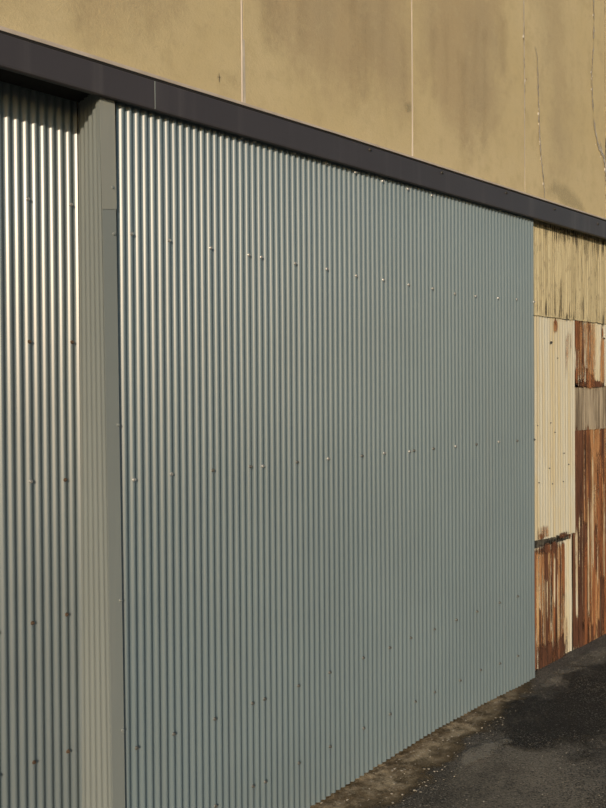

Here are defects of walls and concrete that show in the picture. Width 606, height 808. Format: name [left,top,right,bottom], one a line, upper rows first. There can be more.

crack [523,0,545,199]
crack [590,0,606,173]
damp [539,225,604,256]
corrosion [567,320,605,388]
corrosion [535,426,606,670]